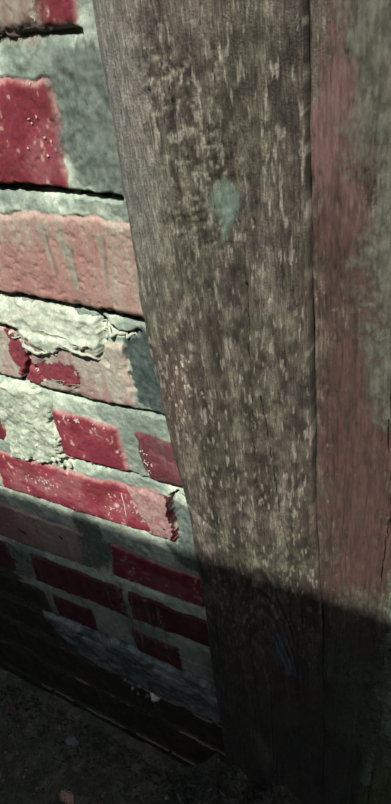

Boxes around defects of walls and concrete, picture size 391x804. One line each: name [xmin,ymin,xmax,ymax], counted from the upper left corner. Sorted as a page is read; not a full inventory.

peeling [3,325,80,388]